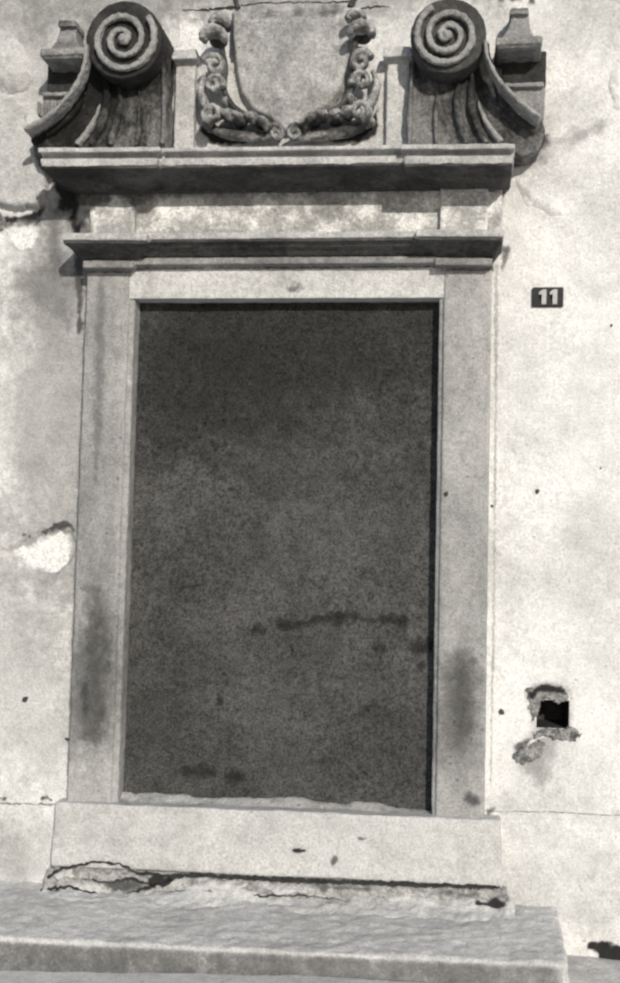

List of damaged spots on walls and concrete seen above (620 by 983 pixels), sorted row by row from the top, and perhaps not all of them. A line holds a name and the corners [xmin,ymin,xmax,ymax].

peeling [608,67,620,111]
peeling [0,92,51,250]
flaking render [13,520,74,573]
flaking render [512,684,582,765]
peeling [54,869,103,893]
peeling [181,879,248,893]
peeling [266,887,307,895]